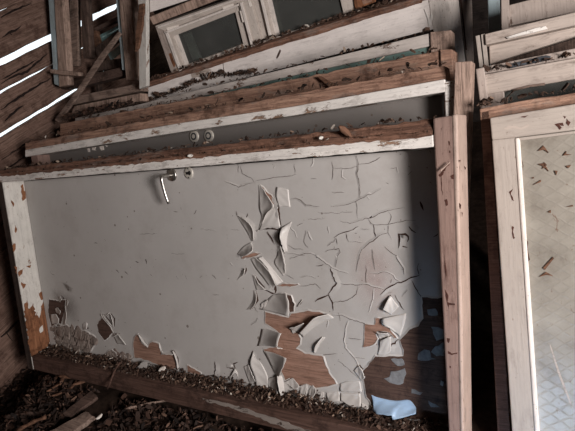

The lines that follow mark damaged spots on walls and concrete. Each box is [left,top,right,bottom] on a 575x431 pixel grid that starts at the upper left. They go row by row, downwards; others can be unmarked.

peeling [24,296,179,372]
crack [225,156,424,376]
peeling [237,184,449,425]